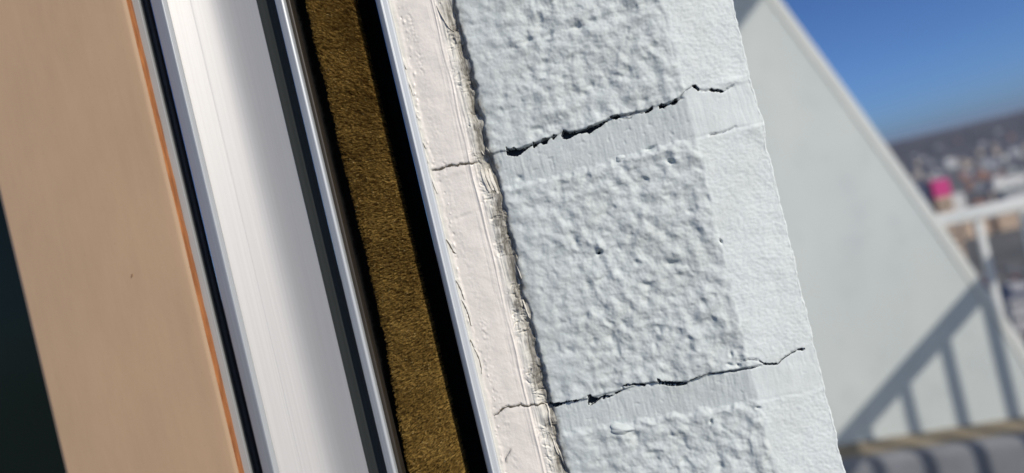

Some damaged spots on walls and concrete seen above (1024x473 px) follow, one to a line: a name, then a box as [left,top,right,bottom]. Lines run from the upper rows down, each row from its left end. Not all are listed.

crack [433,85,730,171]
crack [495,348,805,415]